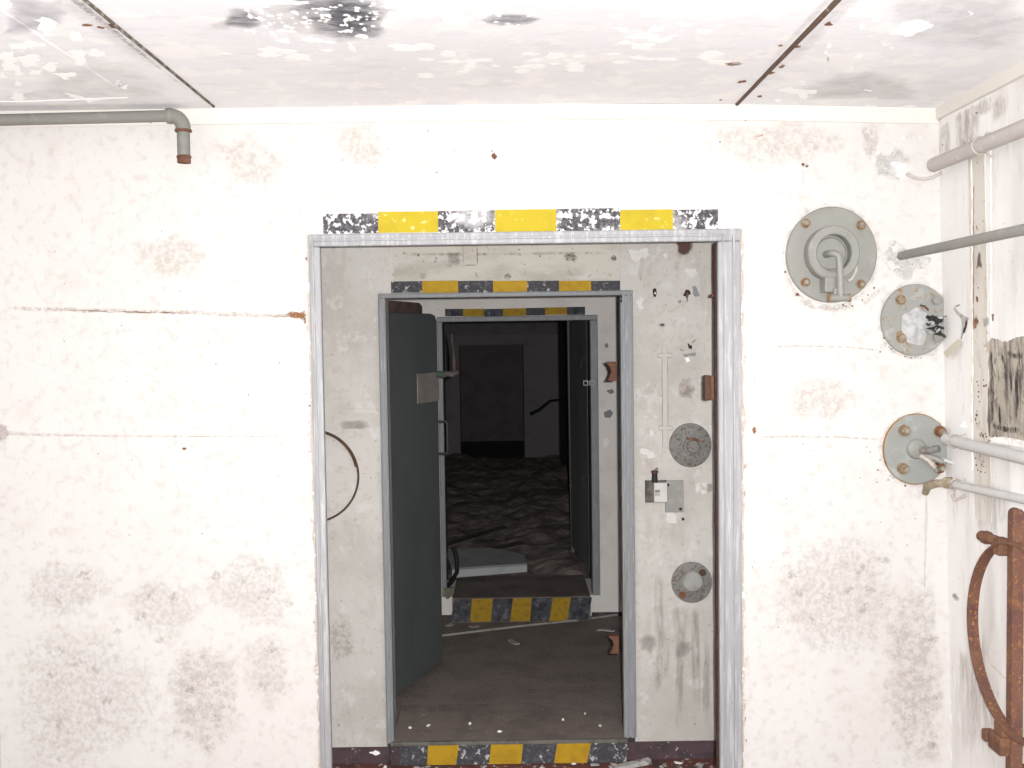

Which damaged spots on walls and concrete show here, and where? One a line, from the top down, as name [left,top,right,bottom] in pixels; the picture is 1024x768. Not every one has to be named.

water stain [336,11,369,29]
peeling [0,17,117,101]
spalling [677,268,700,303]
crack [72,307,171,315]